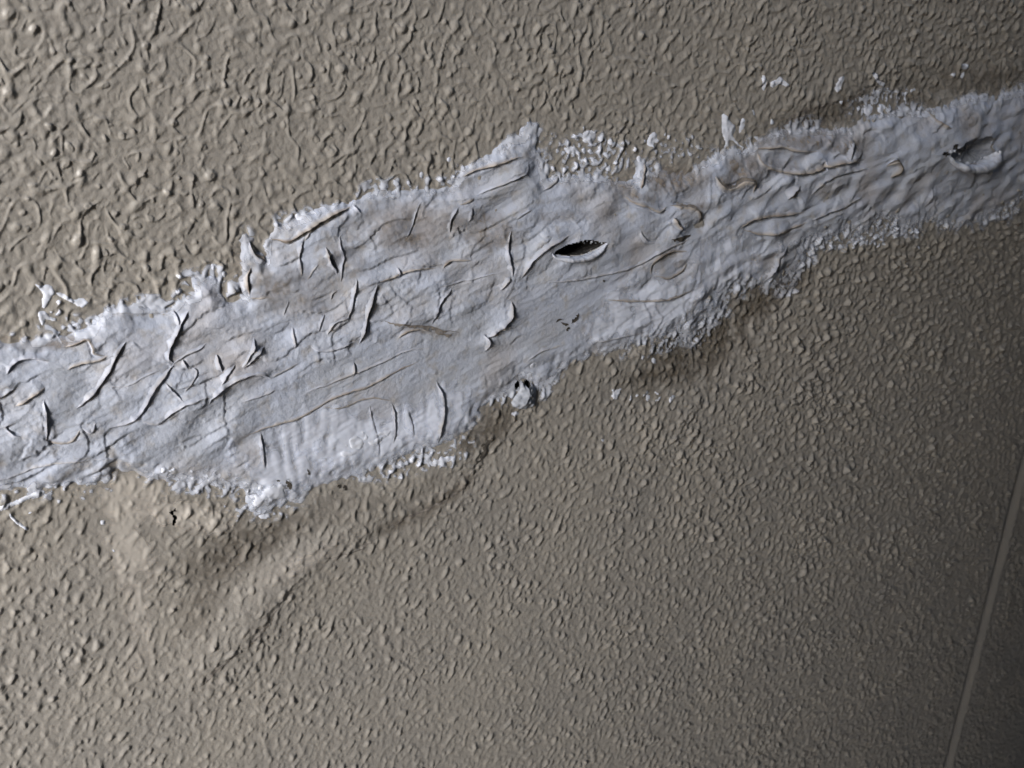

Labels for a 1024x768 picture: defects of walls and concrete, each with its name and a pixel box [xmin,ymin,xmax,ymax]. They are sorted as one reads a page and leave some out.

peeling [762,75,790,91]
peeling [722,110,755,149]
peeling [551,126,670,173]
hole [942,136,1002,173]
hole [555,240,604,256]
crack [672,234,691,242]
peeling [35,284,88,325]
crack [381,320,456,338]
crack [556,313,579,331]
peeling [381,447,455,479]
crack [277,469,310,490]
crack [327,437,494,559]